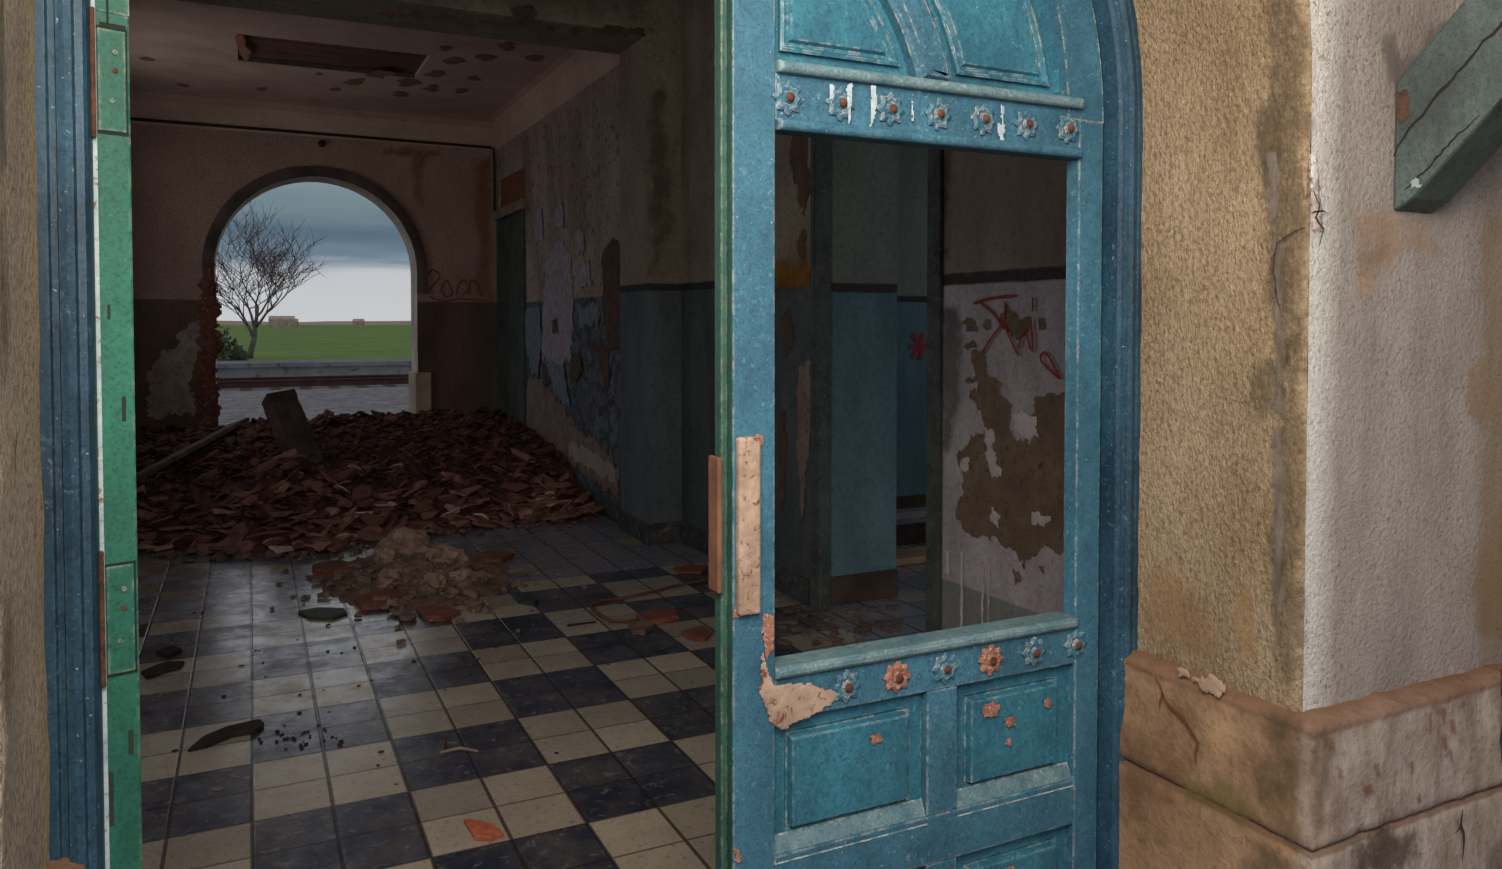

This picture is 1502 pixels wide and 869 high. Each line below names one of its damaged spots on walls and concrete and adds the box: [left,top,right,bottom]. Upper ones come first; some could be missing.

peeling [145,260,224,427]
peeling [525,201,620,497]
peeling [955,304,1065,585]
crack [1155,678,1199,762]
spalling [1177,667,1226,698]
crack [1494,669,1502,759]